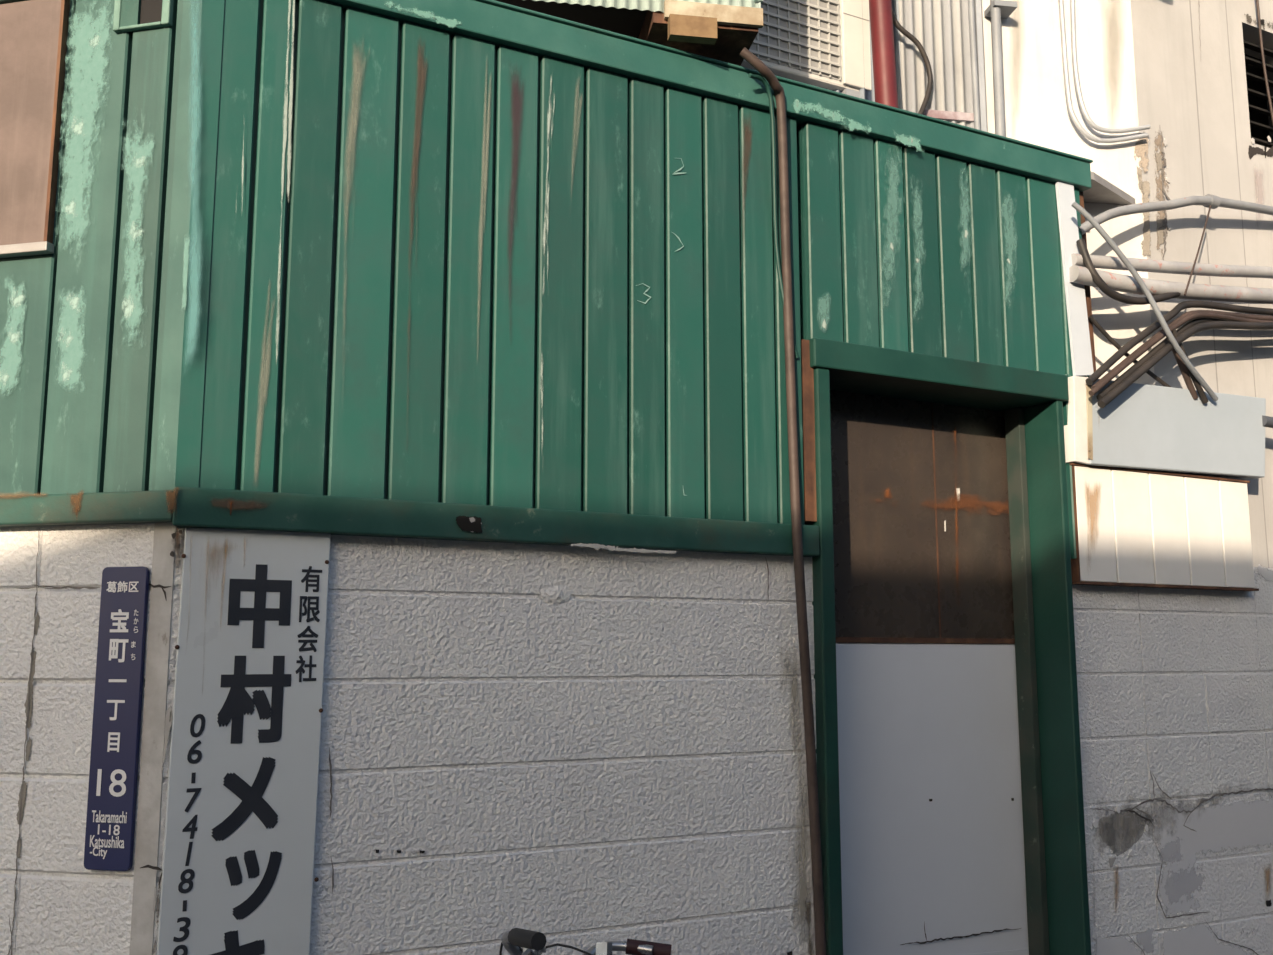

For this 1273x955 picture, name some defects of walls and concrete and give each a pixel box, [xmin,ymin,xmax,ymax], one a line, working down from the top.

peeling [59,1,114,249]
peeling [122,132,154,341]
rust [410,47,426,237]
rust [478,77,490,321]
rust [509,80,523,255]
peeling [0,279,25,394]
peeling [56,290,86,389]
rust [927,493,1007,539]
crack [7,528,100,955]
crack [901,921,1021,945]
peeling [1092,798,1273,918]